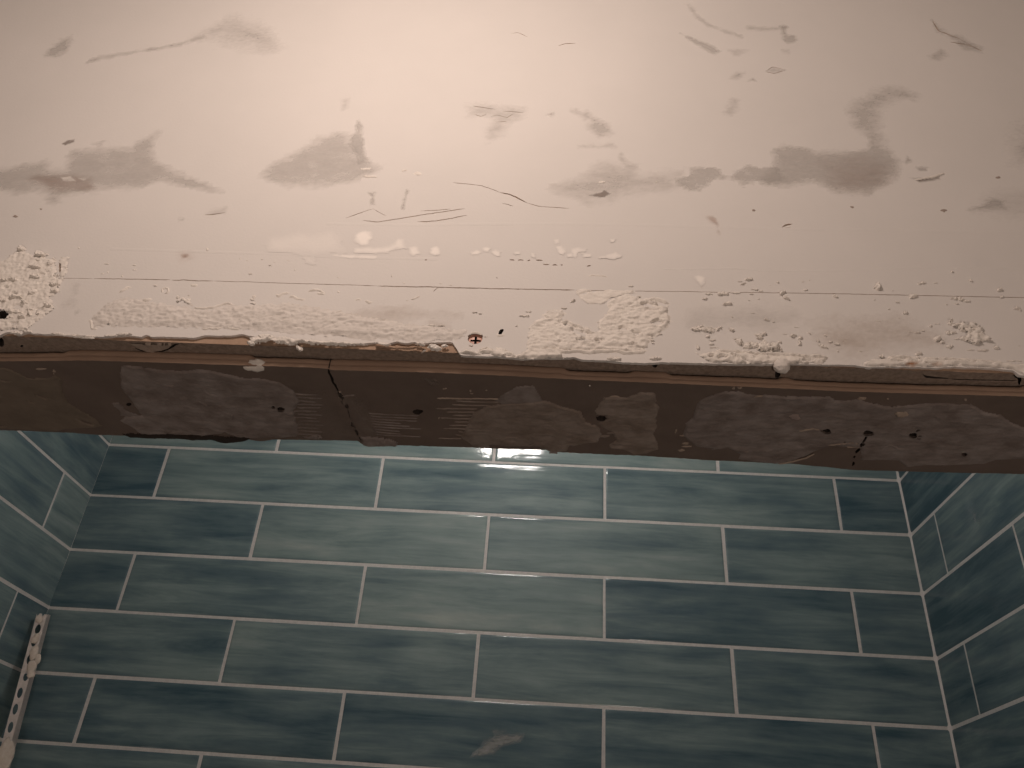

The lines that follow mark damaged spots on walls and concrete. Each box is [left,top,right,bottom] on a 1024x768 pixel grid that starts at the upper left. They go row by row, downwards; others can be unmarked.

flaking render [0,245,70,347]
flaking render [247,285,673,368]
crack [328,359,361,441]